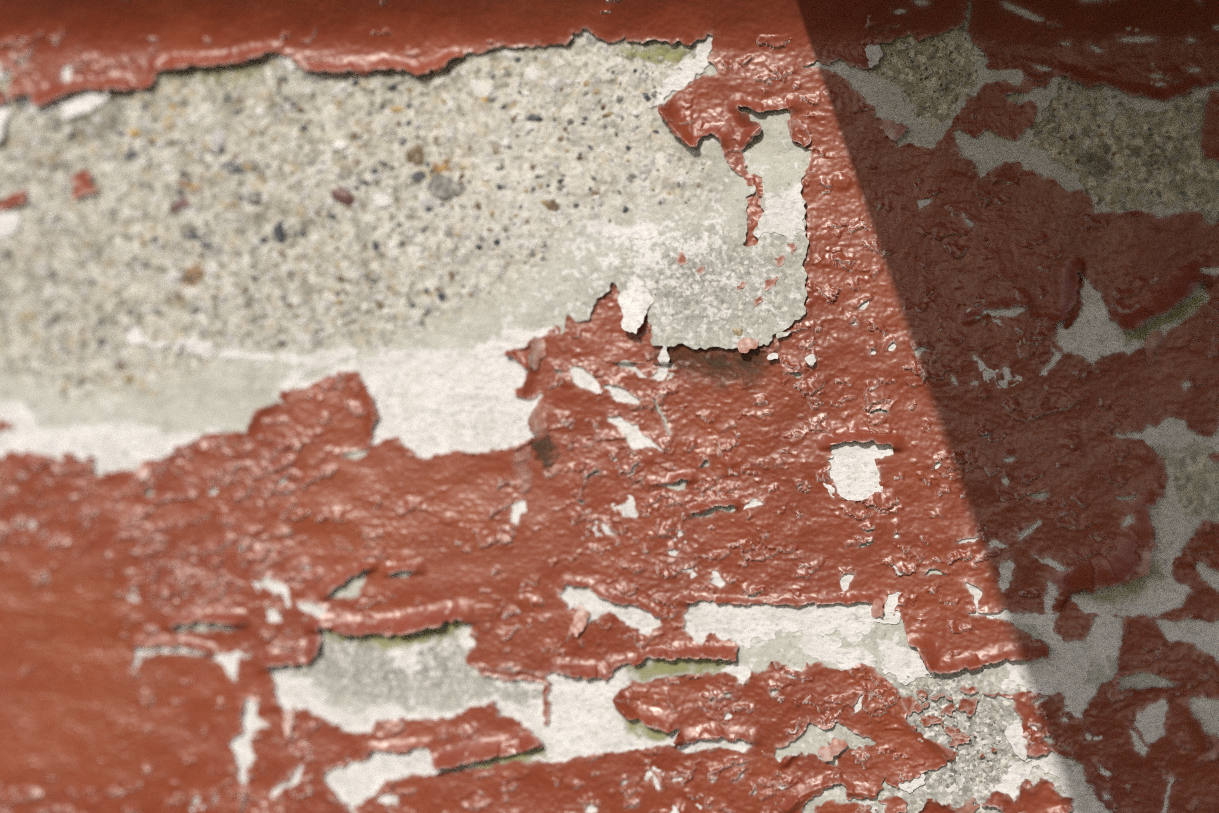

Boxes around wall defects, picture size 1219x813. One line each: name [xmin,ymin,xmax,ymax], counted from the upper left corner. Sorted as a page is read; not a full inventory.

spalling [803,0,1219,226]
spalling [0,28,817,497]
peeling [1040,267,1219,376]
peeling [132,621,251,681]
peeling [230,417,1219,813]